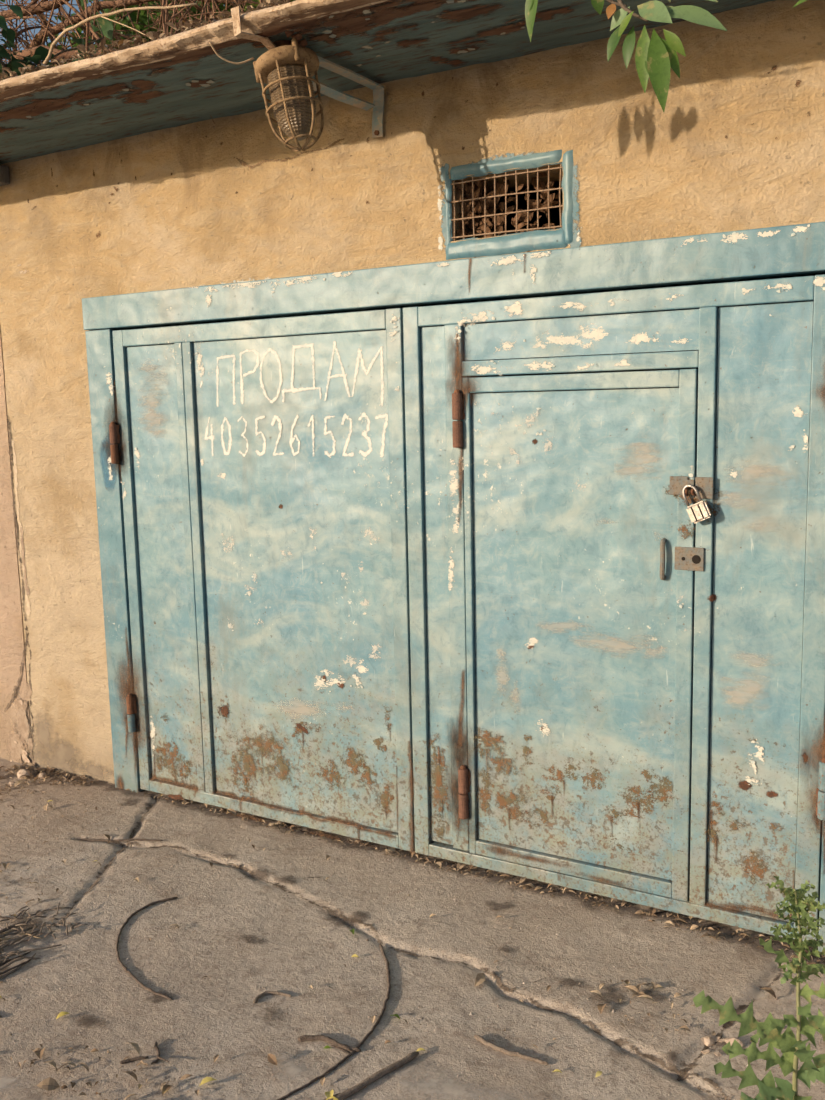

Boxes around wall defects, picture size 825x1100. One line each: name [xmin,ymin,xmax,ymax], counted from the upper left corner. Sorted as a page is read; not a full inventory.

peeling [0,0,574,133]
peeling [721,224,810,243]
peeling [454,301,524,343]
peeling [471,323,609,375]
corrosion [106,383,126,475]
peeling [449,456,464,533]
crack [5,415,34,756]
peeling [314,644,382,692]
corrosion [150,742,198,800]
corrosion [215,722,413,853]
corrosion [429,671,602,837]
corrosion [605,769,677,853]